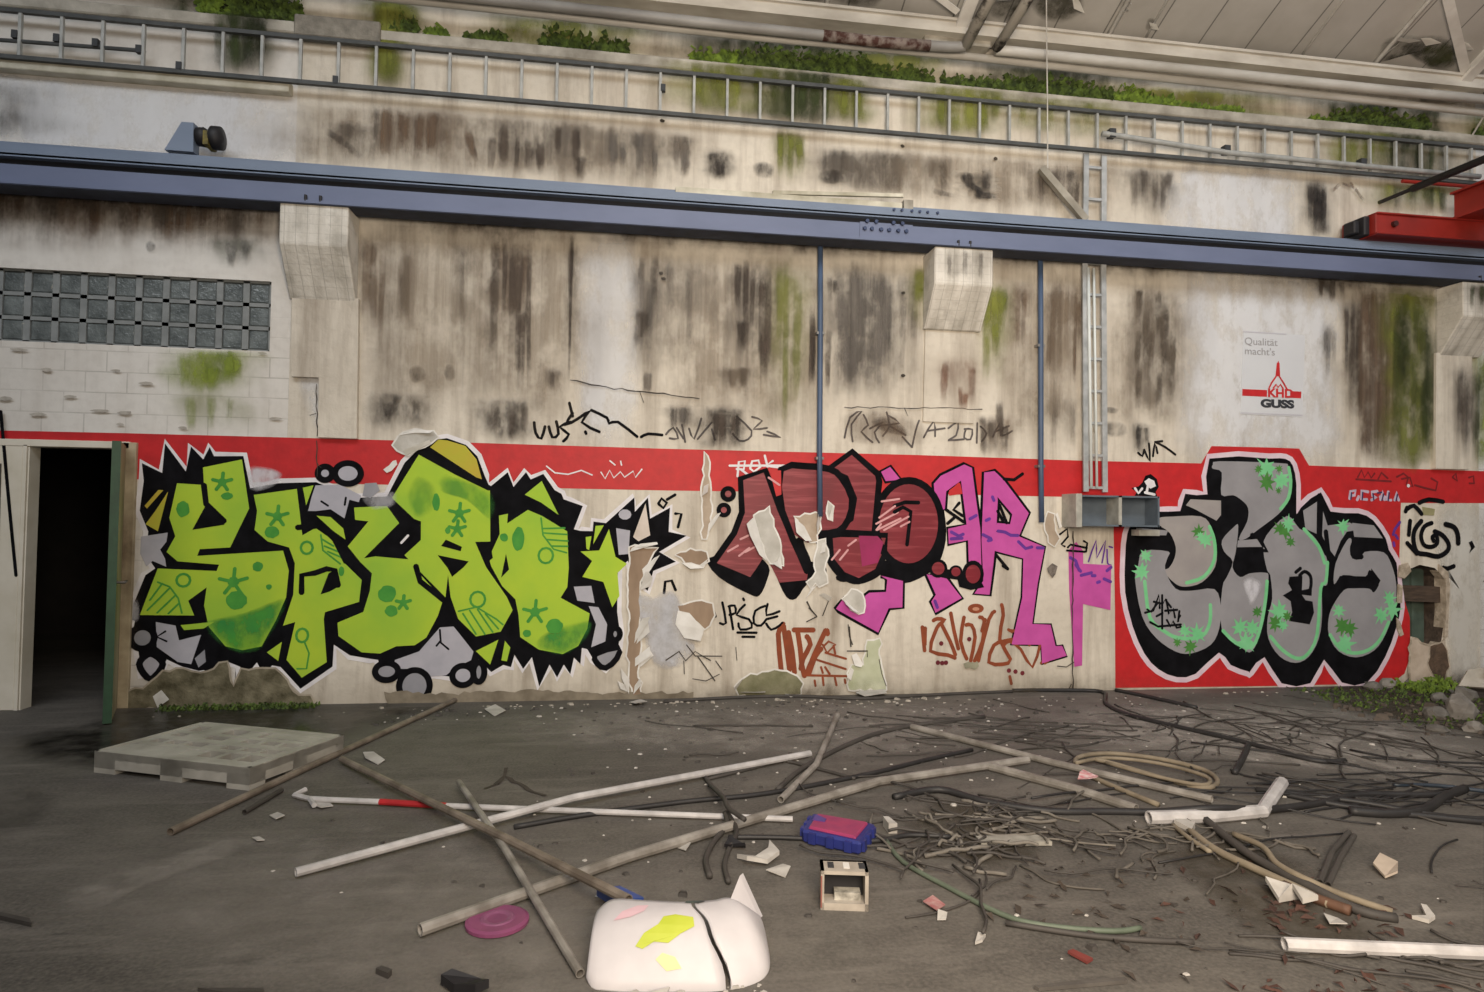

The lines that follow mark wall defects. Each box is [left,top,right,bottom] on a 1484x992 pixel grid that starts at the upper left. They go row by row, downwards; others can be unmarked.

leakage [378,111,691,172]
leakage [823,151,1005,199]
leakage [1307,182,1362,231]
leakage [491,246,573,367]
leakage [689,267,785,385]
leakage [809,274,892,378]
leakage [984,293,1082,371]
leakage [1135,291,1176,400]
peeling [747,501,866,615]
peeling [734,668,804,696]
peeling [846,637,887,692]
spalling [1396,563,1450,682]